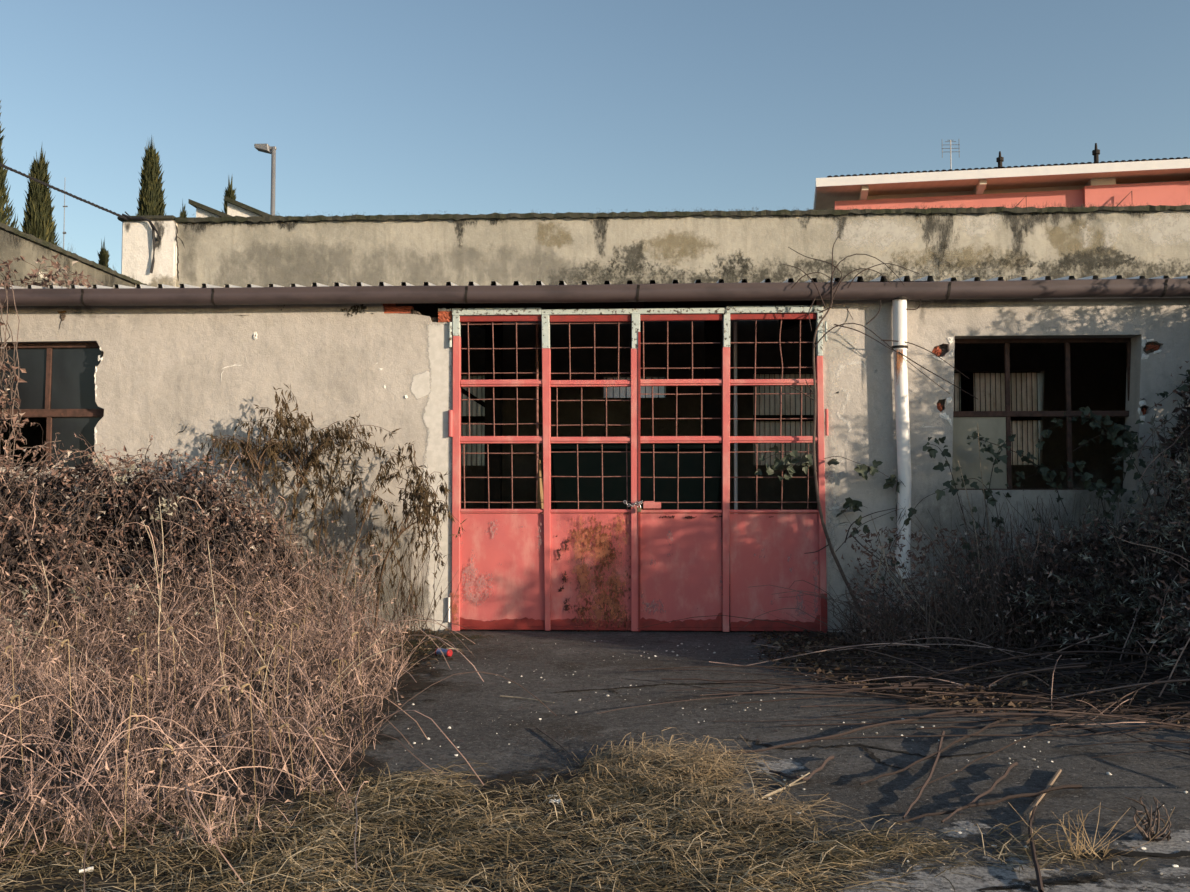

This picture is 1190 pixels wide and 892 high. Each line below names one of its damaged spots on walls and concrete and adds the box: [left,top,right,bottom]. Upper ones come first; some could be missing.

leakage [154,221,164,248]
leakage [183,222,259,232]
leakage [455,219,504,242]
leakage [549,204,1190,285]
spalling [382,303,453,322]
spalling [932,337,954,362]
spalling [1141,338,1162,360]
corrosion [568,513,631,627]